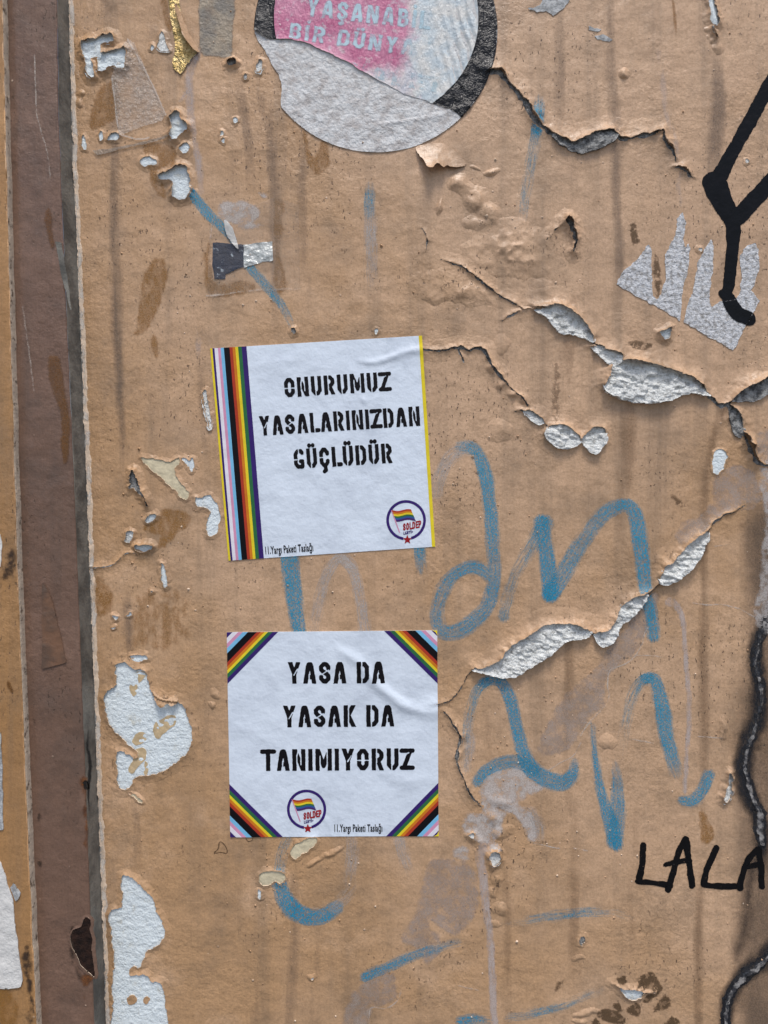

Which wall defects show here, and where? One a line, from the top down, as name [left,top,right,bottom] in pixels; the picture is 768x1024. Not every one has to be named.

peeling [68,0,200,95]
peeling [55,109,124,330]
peeling [135,105,198,208]
peeling [416,143,466,167]
peeling [537,207,587,264]
peeling [652,322,677,346]
spalling [2,0,42,1024]
peeling [120,452,225,596]
crack [410,218,768,846]
peeling [708,447,730,479]
peeling [83,530,202,806]
peeling [99,798,175,1024]